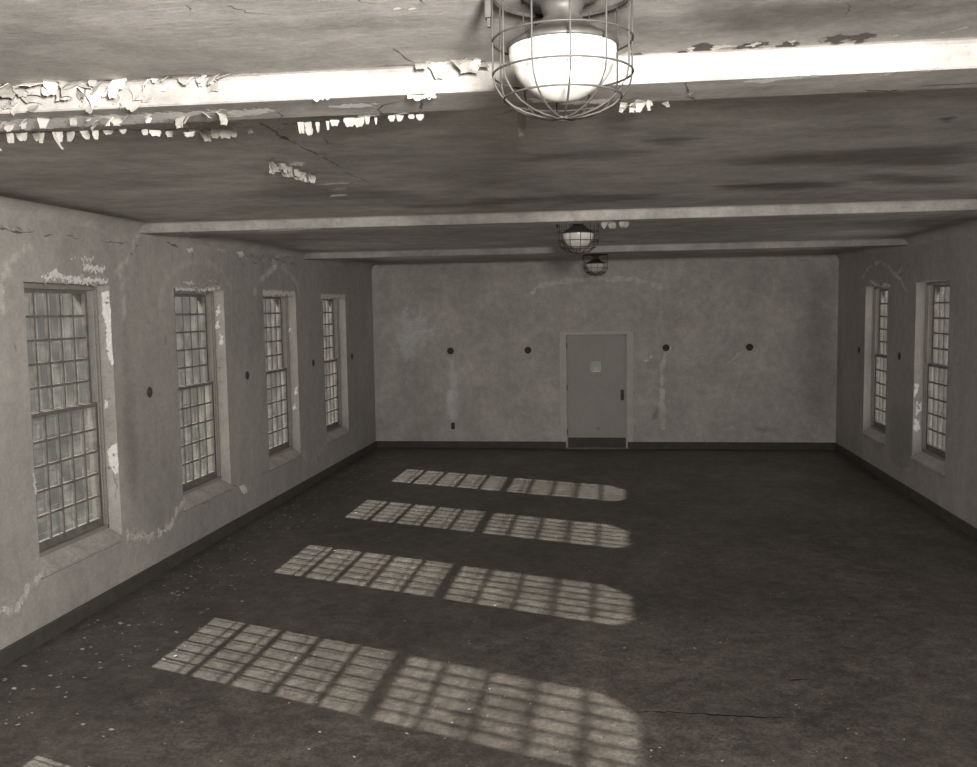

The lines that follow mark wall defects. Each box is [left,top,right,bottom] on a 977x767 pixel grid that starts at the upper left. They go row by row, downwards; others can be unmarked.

peeling [677,40,800,53]
peeling [817,33,877,45]
peeling [0,74,276,151]
peeling [283,92,437,136]
crack [378,101,424,117]
peeling [496,98,670,137]
crack [788,83,974,97]
crack [257,109,367,182]
peeling [268,158,349,197]
peeling [41,234,139,409]
peeling [106,443,119,502]